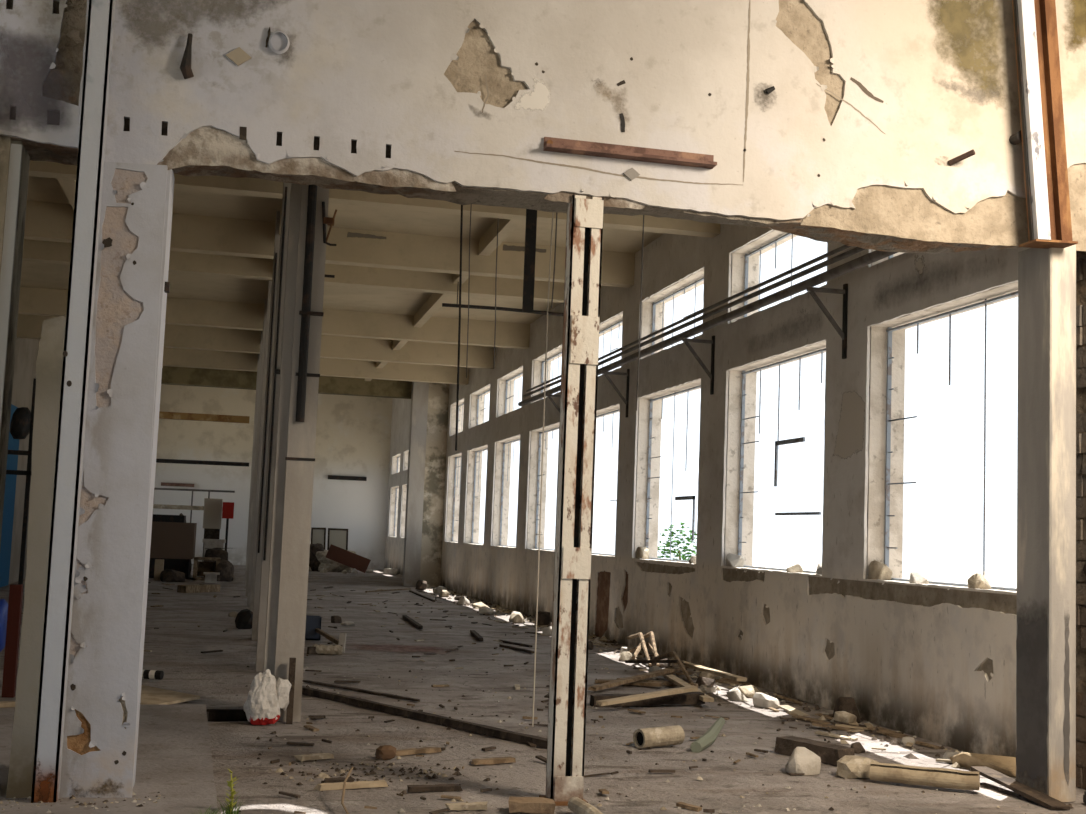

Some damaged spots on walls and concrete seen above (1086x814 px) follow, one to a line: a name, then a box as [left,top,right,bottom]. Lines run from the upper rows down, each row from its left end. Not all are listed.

damp [130,0,274,42]
spalling [444,20,550,116]
spalling [770,0,844,125]
damp [931,0,1003,102]
damp [1069,0,1086,48]
spalling [157,126,457,192]
spalling [801,180,1029,246]
spalling [1067,164,1086,282]
peeling [94,169,148,410]
flaking render [1076,304,1086,389]
flaking render [1076,413,1086,647]
flaking render [1076,692,1086,789]